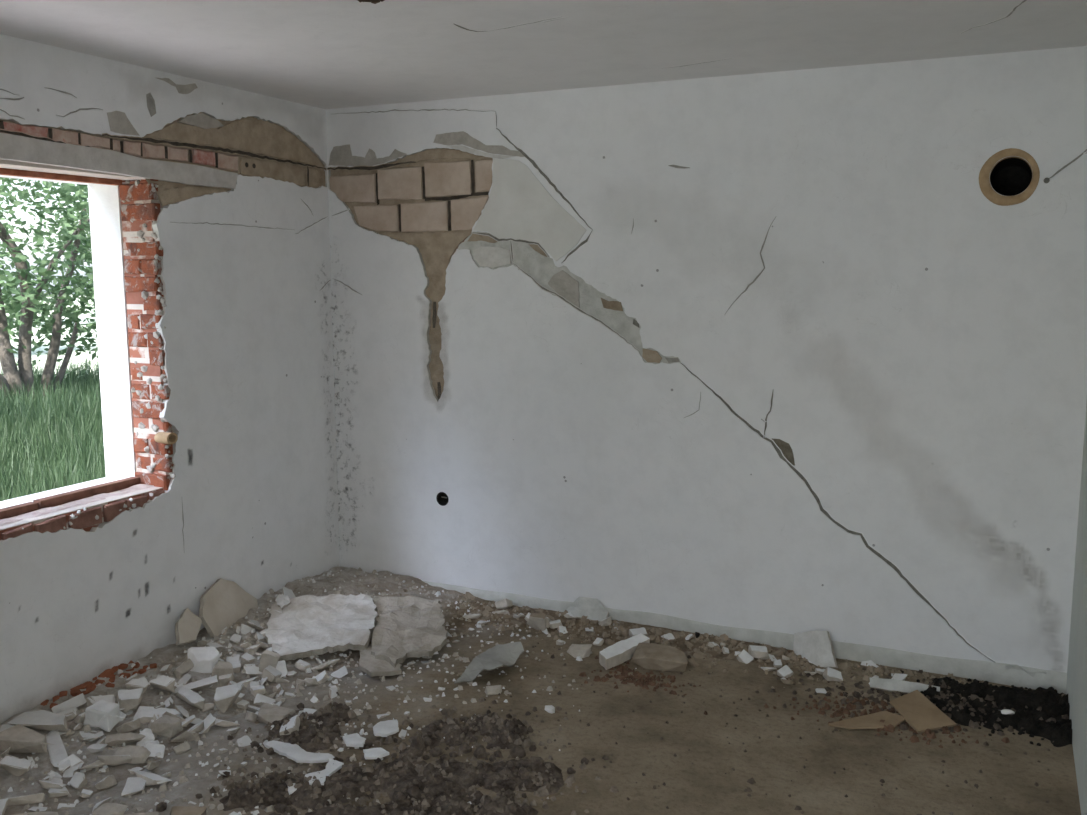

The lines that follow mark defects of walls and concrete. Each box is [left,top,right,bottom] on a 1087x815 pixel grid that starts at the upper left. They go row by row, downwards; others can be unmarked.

peeling [146,93,156,117]
peeling [157,78,198,94]
crack [668,162,690,170]
flaking render [0,111,681,400]
crack [724,216,777,316]
crack [680,362,1007,664]